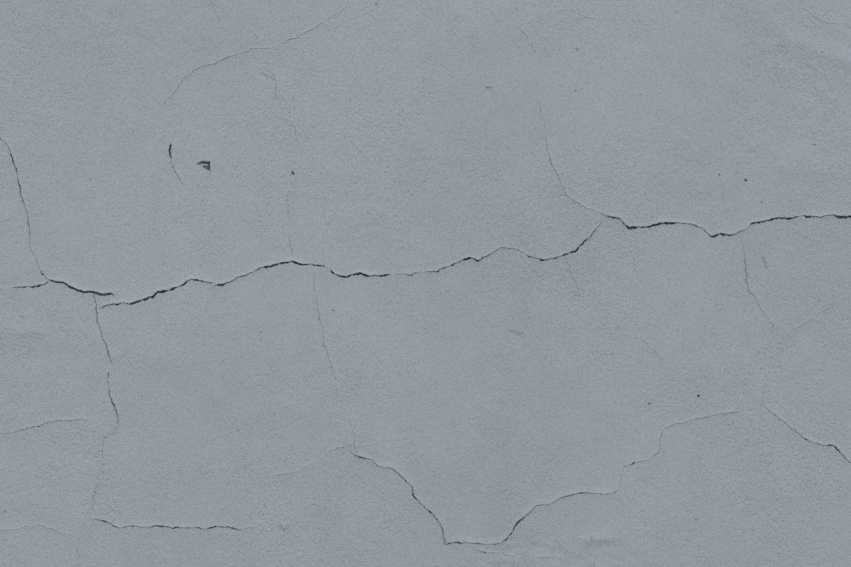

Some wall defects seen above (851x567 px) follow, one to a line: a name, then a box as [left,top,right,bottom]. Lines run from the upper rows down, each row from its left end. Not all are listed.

crack [139,1,352,115]
crack [0,65,851,365]
crack [0,416,89,437]
crack [87,371,263,535]
crack [615,393,851,490]